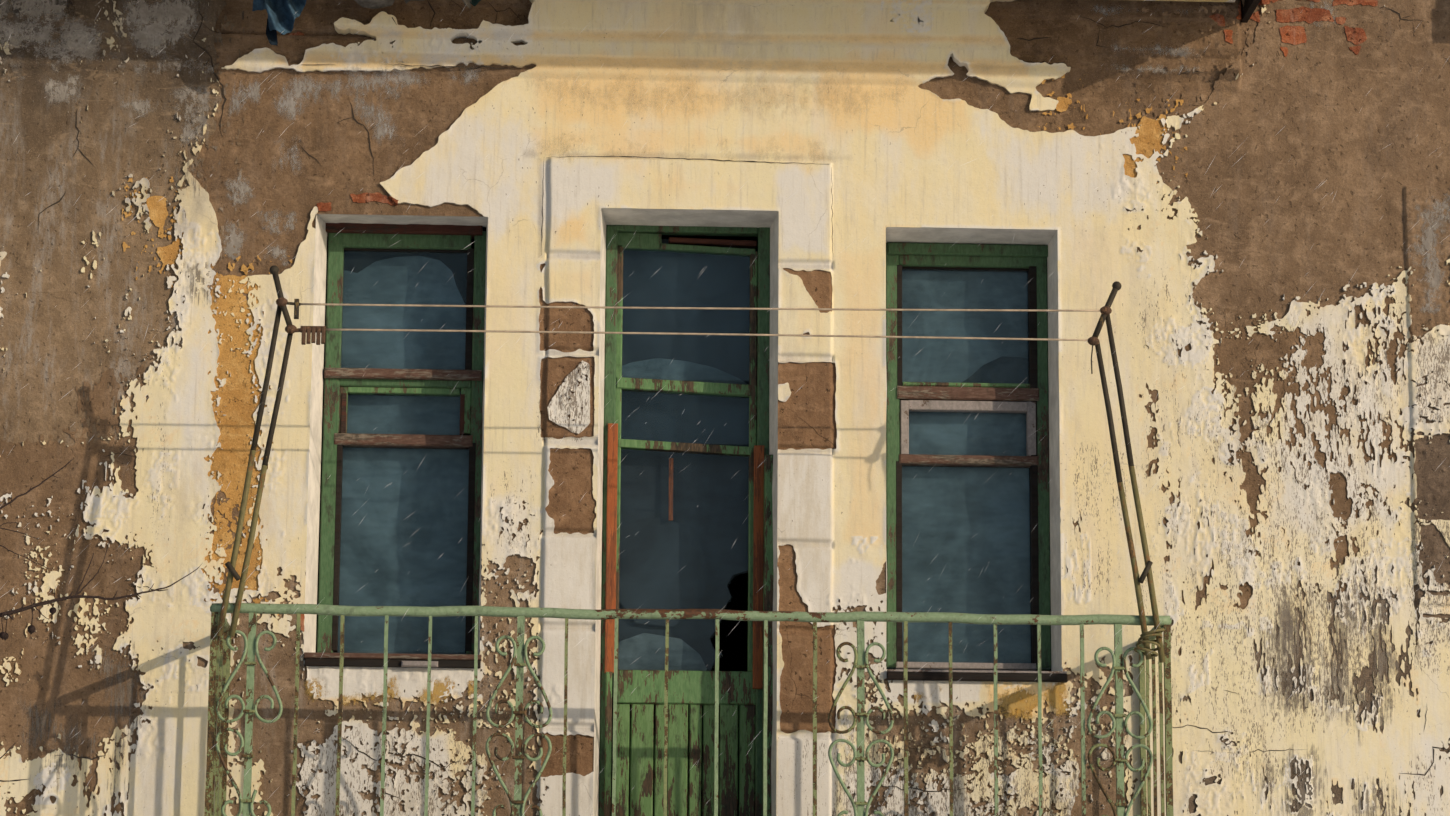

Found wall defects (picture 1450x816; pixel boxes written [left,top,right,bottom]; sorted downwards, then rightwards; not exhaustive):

flaking render [783,268,832,313]
peeling [0,0,596,816]
flaking render [778,362,837,450]
peeling [918,0,1450,733]
peeling [777,545,1138,816]
leakage [1262,591,1398,737]
peeling [1182,769,1222,816]
leakage [1260,747,1328,816]
peeling [1219,732,1426,816]
leakage [1353,777,1401,816]